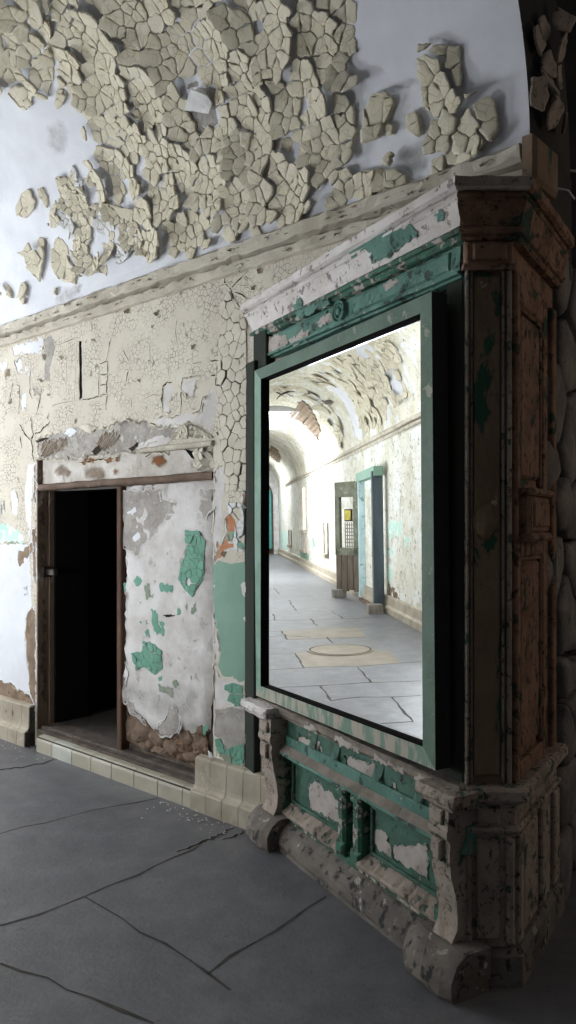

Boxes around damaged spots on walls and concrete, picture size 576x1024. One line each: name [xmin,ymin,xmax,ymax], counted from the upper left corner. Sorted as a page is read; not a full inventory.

peeling [529,7,576,134]
peeling [0,0,500,411]
crack [9,271,248,492]
peeling [0,375,246,711]
spalling [125,614,246,767]
crack [175,827,246,853]
peeling [298,722,322,752]
peeling [308,782,338,822]
peeling [333,736,425,788]
peeling [375,829,429,877]